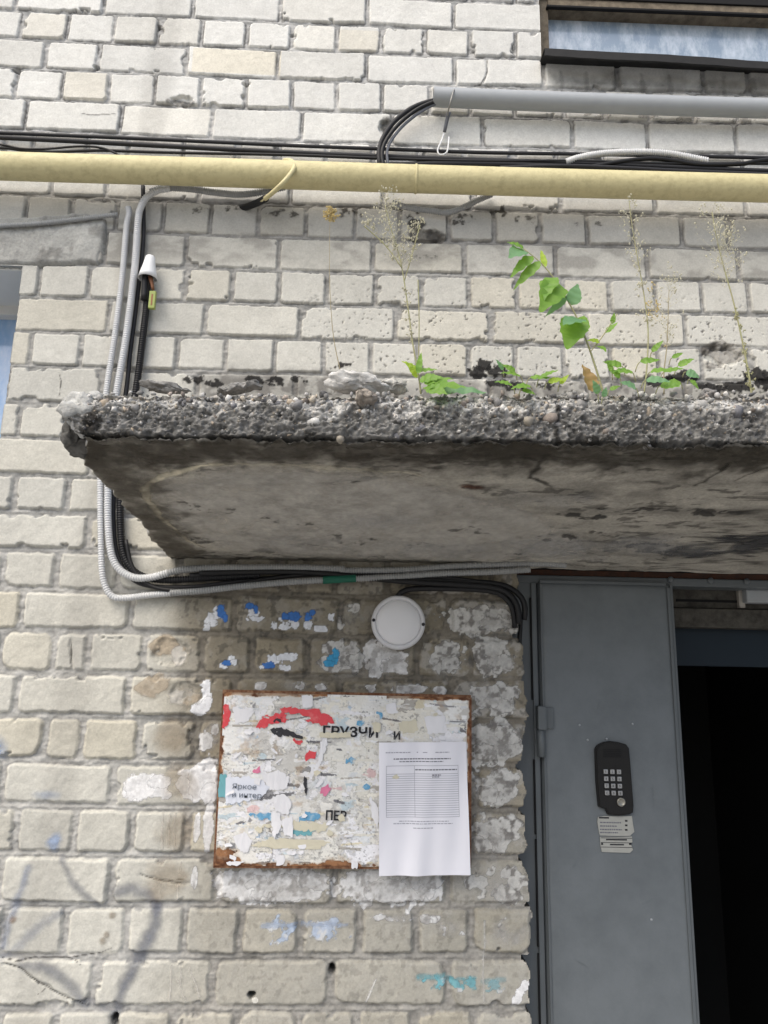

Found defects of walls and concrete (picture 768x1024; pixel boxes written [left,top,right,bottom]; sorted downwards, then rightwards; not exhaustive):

spalling [56,390,768,460]
leakage [79,409,768,560]